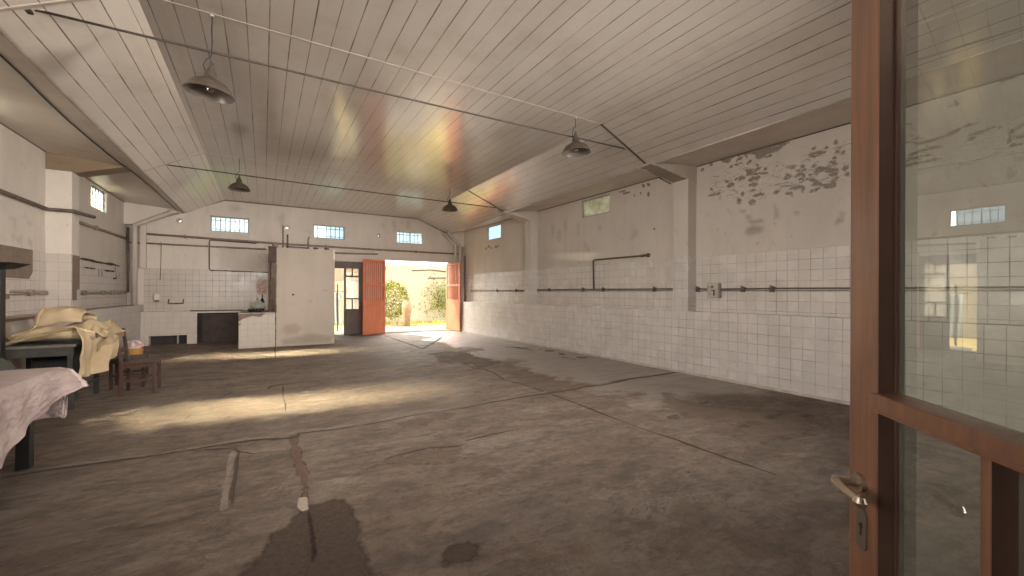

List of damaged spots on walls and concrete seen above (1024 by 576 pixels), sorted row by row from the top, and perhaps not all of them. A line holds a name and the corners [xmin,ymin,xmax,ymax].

peeling [701,140,849,206]
crack [3,362,776,478]
water stain [239,499,373,576]
water stain [442,541,479,567]